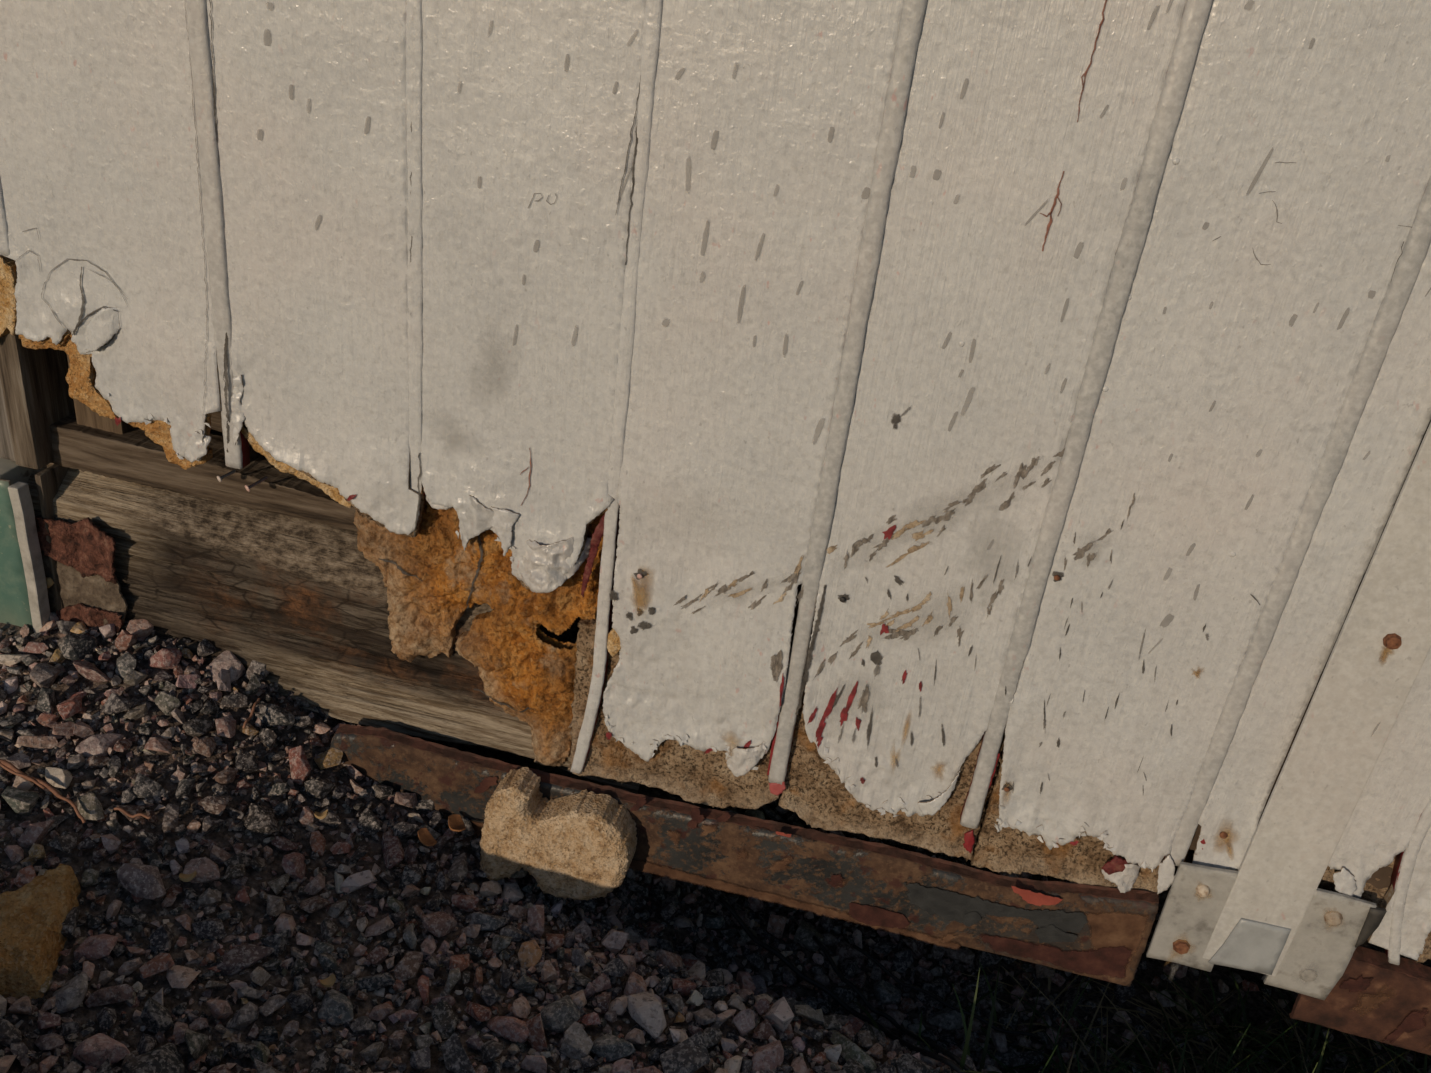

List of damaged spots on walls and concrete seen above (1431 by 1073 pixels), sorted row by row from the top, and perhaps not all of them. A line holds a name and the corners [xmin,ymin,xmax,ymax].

crack [1077,0,1107,122]
crack [1040,171,1064,251]
peeling [85,307,121,352]
peeling [176,423,212,462]
peeling [231,375,245,445]
peeling [35,517,128,632]
peeling [426,495,592,593]
rust [470,821,484,838]
peeling [705,740,767,777]
peeling [865,770,960,817]
peeling [994,806,1175,894]
rust [628,857,960,949]